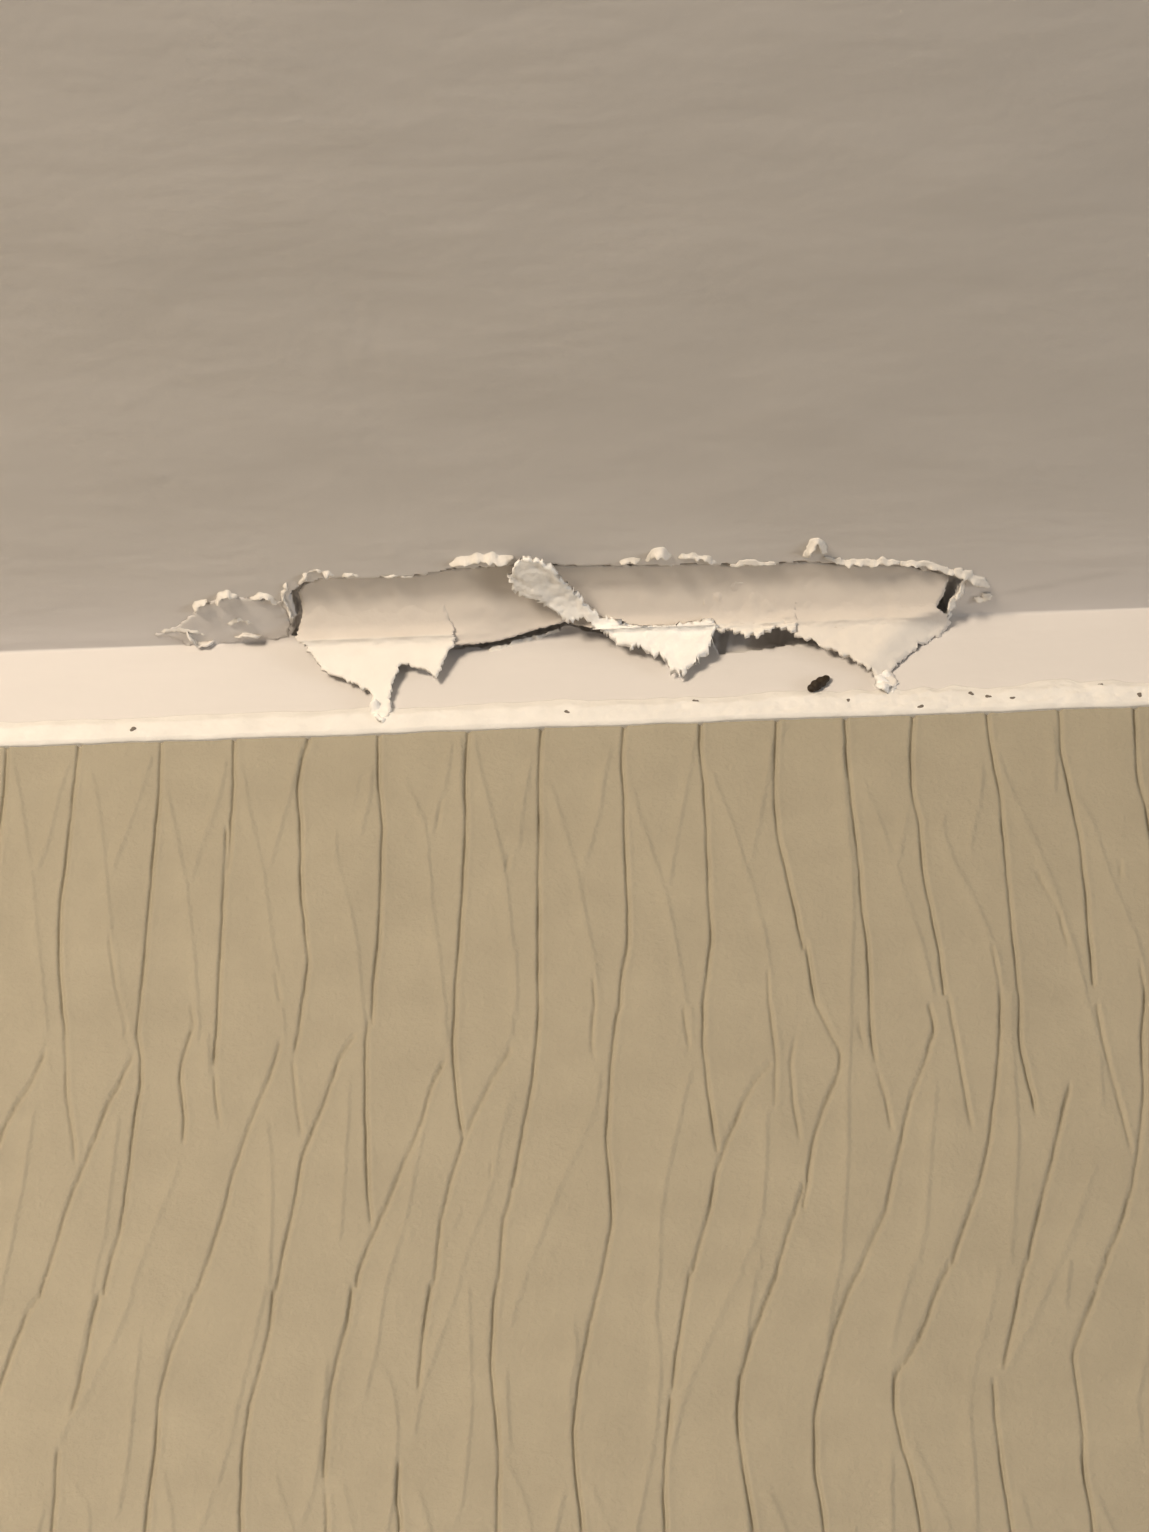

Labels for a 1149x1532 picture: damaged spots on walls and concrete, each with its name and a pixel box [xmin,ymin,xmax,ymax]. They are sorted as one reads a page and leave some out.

peeling [155,538,992,723]